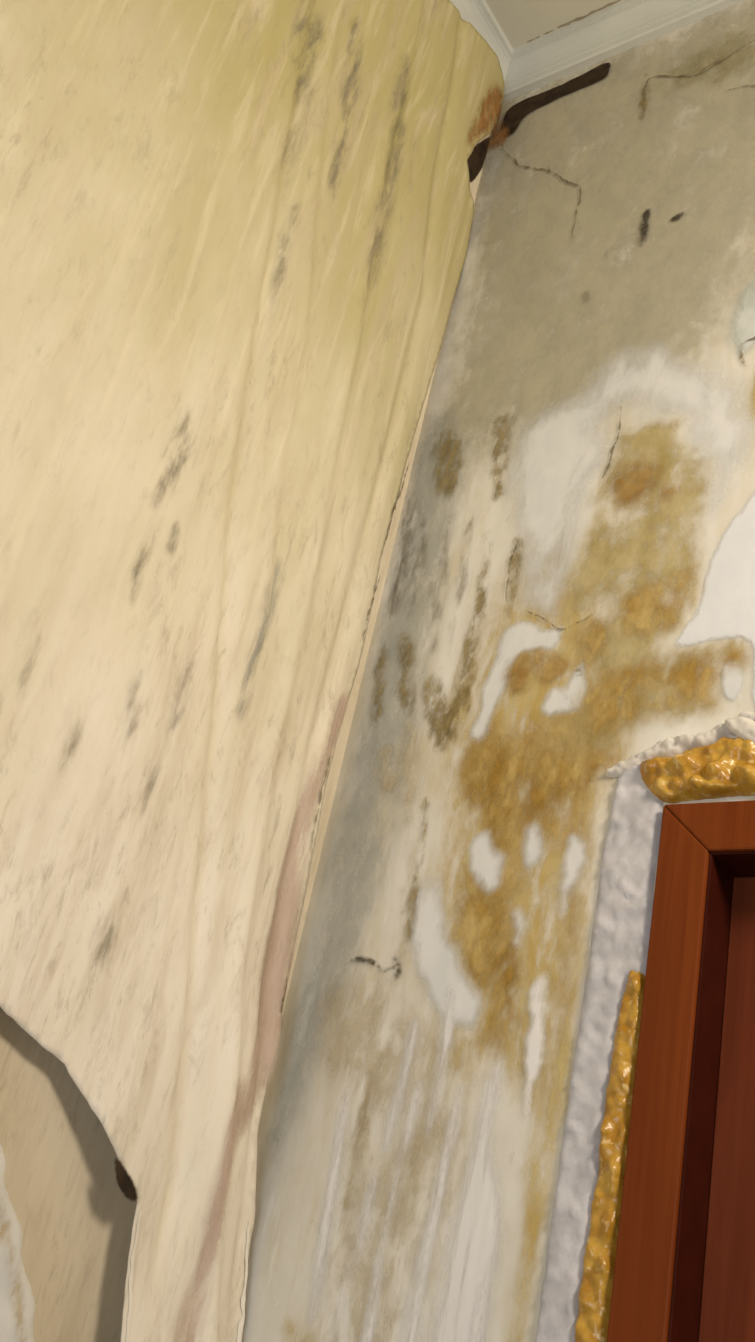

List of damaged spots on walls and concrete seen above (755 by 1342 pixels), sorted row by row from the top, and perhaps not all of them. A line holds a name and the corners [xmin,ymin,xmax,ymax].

crack [640,42,755,112]
rust [469,88,507,148]
crack [500,144,581,235]
peeling [732,283,755,363]
leakage [248,616,269,679]
leakage [283,4,755,1342]
leakage [196,697,347,1289]